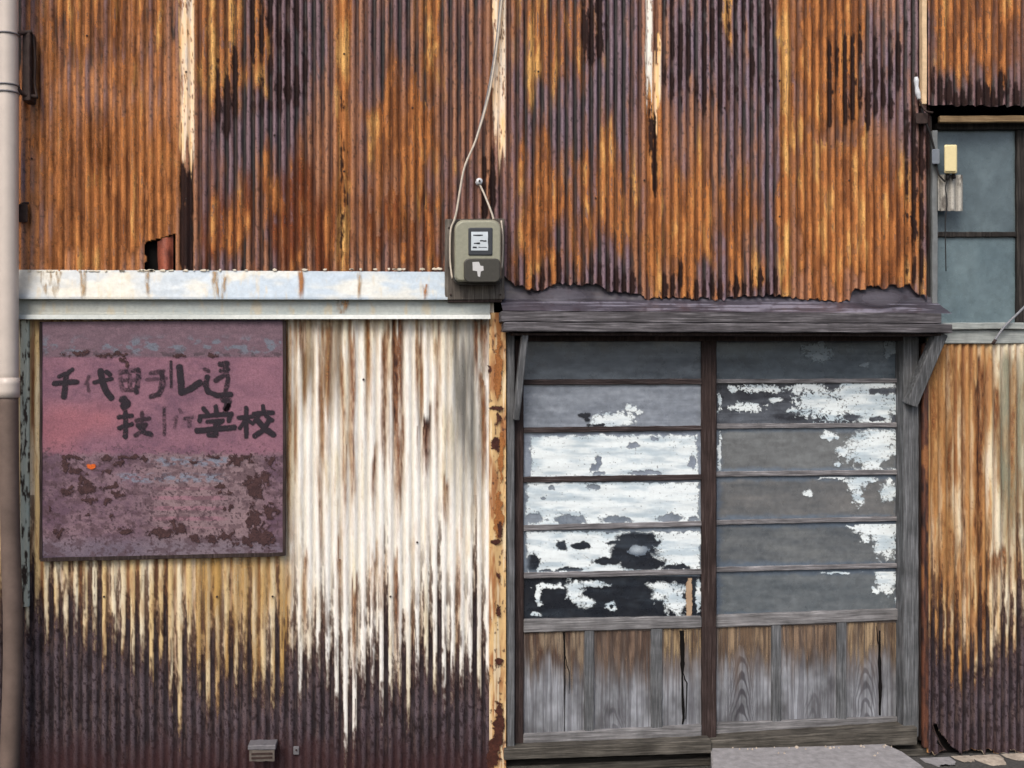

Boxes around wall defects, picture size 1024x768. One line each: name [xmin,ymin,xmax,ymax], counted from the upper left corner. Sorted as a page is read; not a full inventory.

rust [30,0,361,297]
rust [513,0,1021,300]
spalling [137,233,248,272]
leakage [325,323,341,385]
leakage [454,323,481,457]
peeling [525,404,701,616]
peeling [717,383,896,506]
peeling [846,524,896,601]
rust [928,344,1024,755]
rust [19,496,505,768]
crack [679,631,688,724]
crack [875,627,883,715]